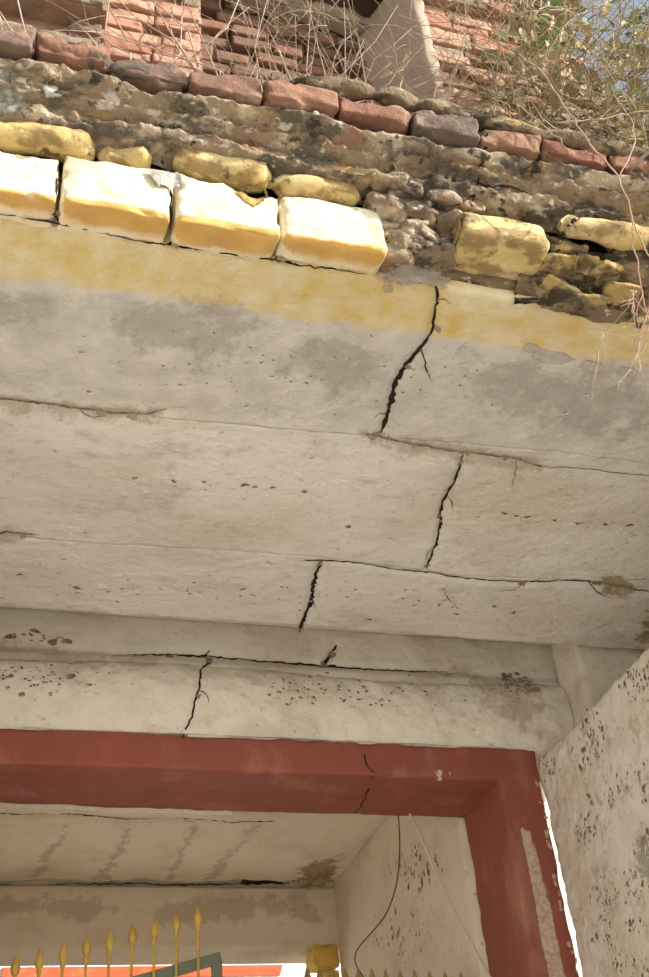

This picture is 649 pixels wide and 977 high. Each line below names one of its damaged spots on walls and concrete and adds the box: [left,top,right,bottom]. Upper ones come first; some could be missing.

spalling [362,170,485,276]
crack [442,133,527,253]
crack [547,210,591,263]
spalling [513,233,649,329]
crack [297,270,649,632]
crack [119,645,444,739]
crack [354,753,379,813]
crack [47,866,334,886]
flaking render [521,828,578,977]
flaking render [587,828,649,977]